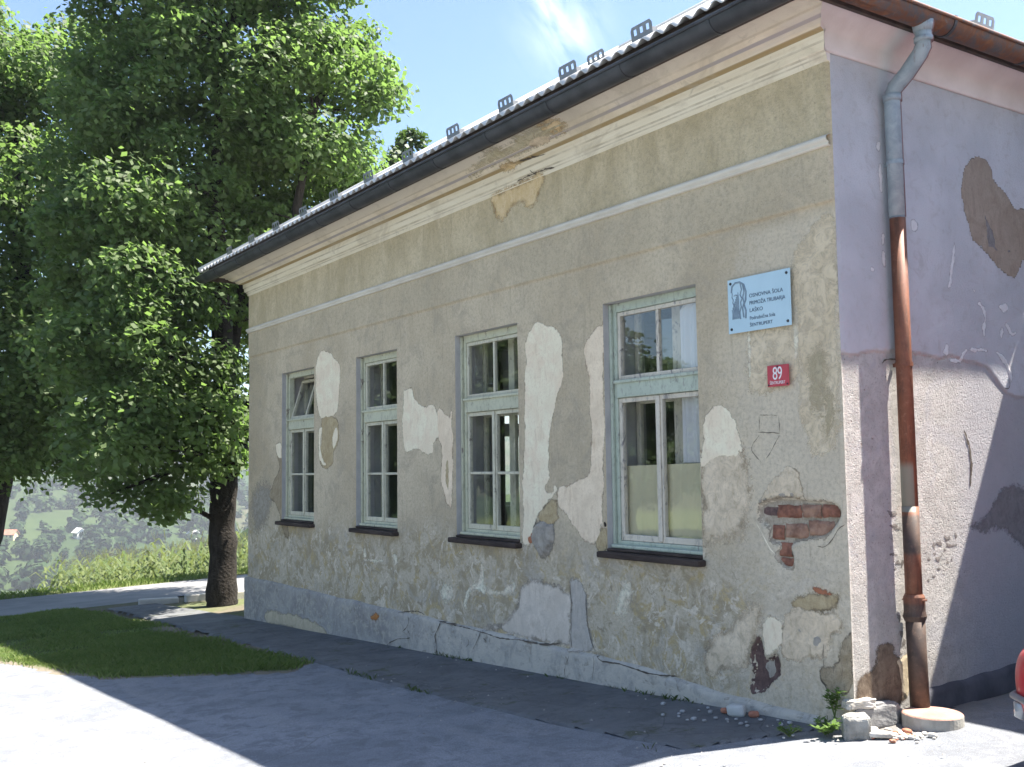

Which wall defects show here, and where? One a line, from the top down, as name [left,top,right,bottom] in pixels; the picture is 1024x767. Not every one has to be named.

peeling [469,118,568,223]
peeling [961,156,1024,278]
peeling [315,350,340,469]
peeling [402,387,454,509]
peeling [521,321,607,551]
peeling [700,405,844,571]
peeling [482,578,572,645]
crack [389,611,676,677]
peeling [704,587,909,705]